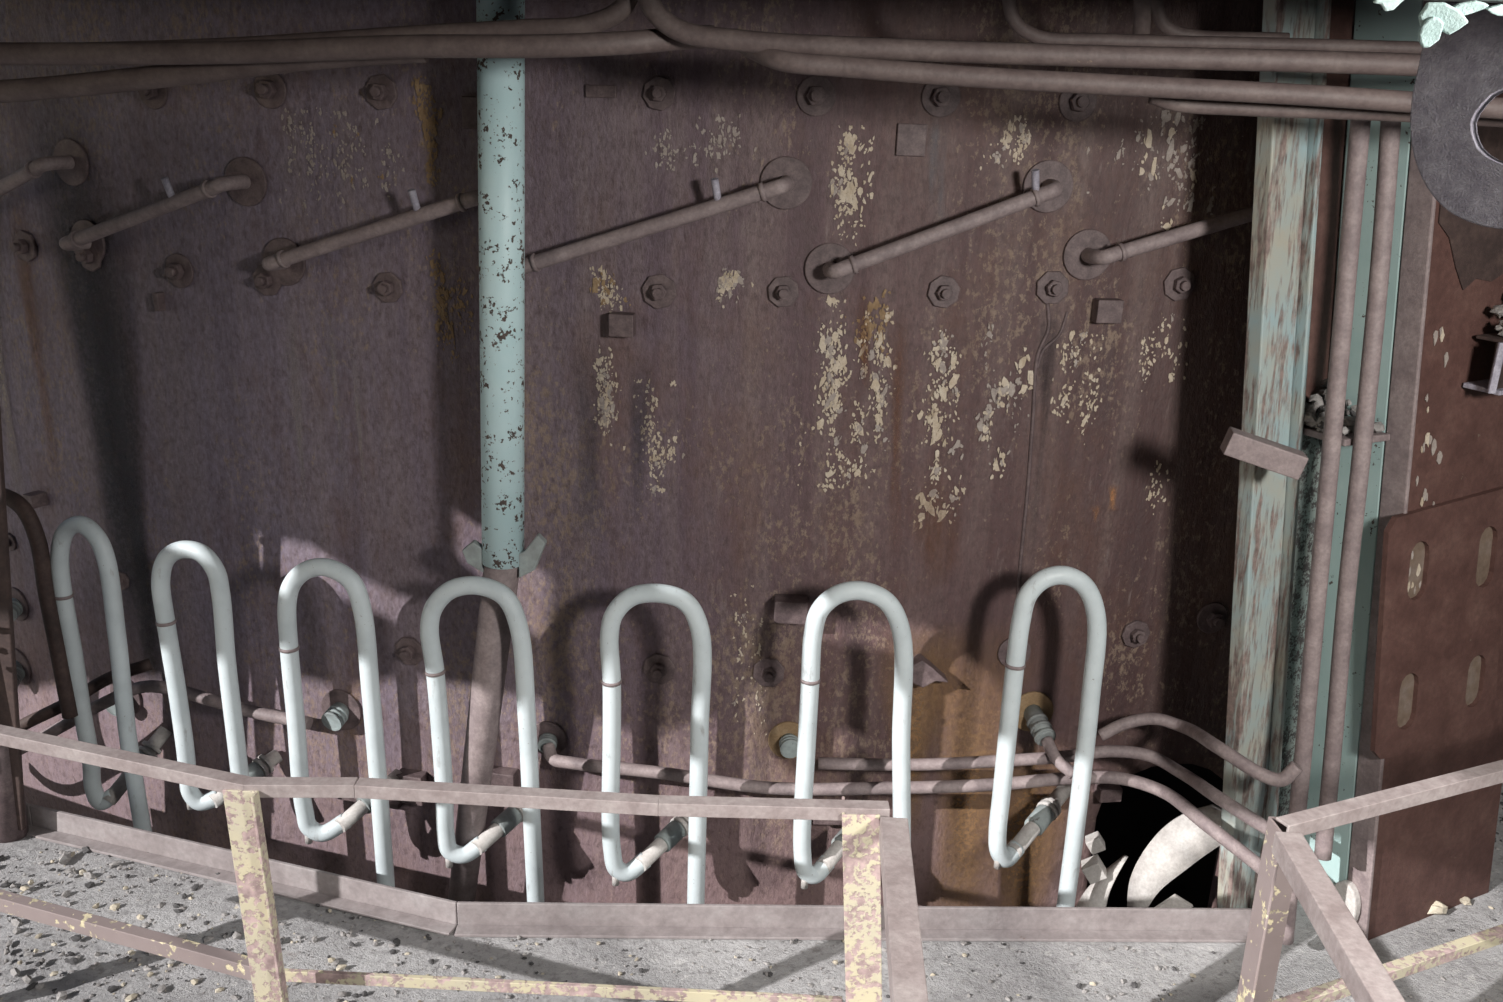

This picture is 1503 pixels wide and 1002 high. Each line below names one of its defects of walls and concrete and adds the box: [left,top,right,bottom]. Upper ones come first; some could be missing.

peeling [828,125,874,246]
peeling [980,115,1031,170]
peeling [1114,110,1216,231]
peeling [589,265,631,313]
peeling [593,345,685,497]
peeling [798,289,897,492]
peeling [910,324,1033,529]
peeling [1050,330,1104,445]
peeling [1139,313,1188,392]
rust [910,686,931,795]
rust [948,700,987,896]
rust [1002,774,1052,907]